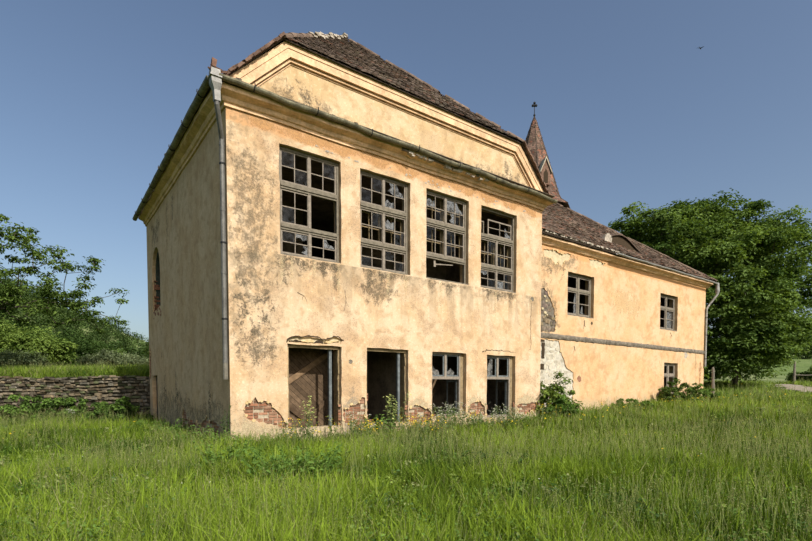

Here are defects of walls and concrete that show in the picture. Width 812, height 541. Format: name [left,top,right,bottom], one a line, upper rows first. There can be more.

leakage [237,329,277,366]
flaking render [513,288,582,420]
flaking render [240,398,291,441]
flaking render [338,393,372,436]
flaking render [404,397,436,429]